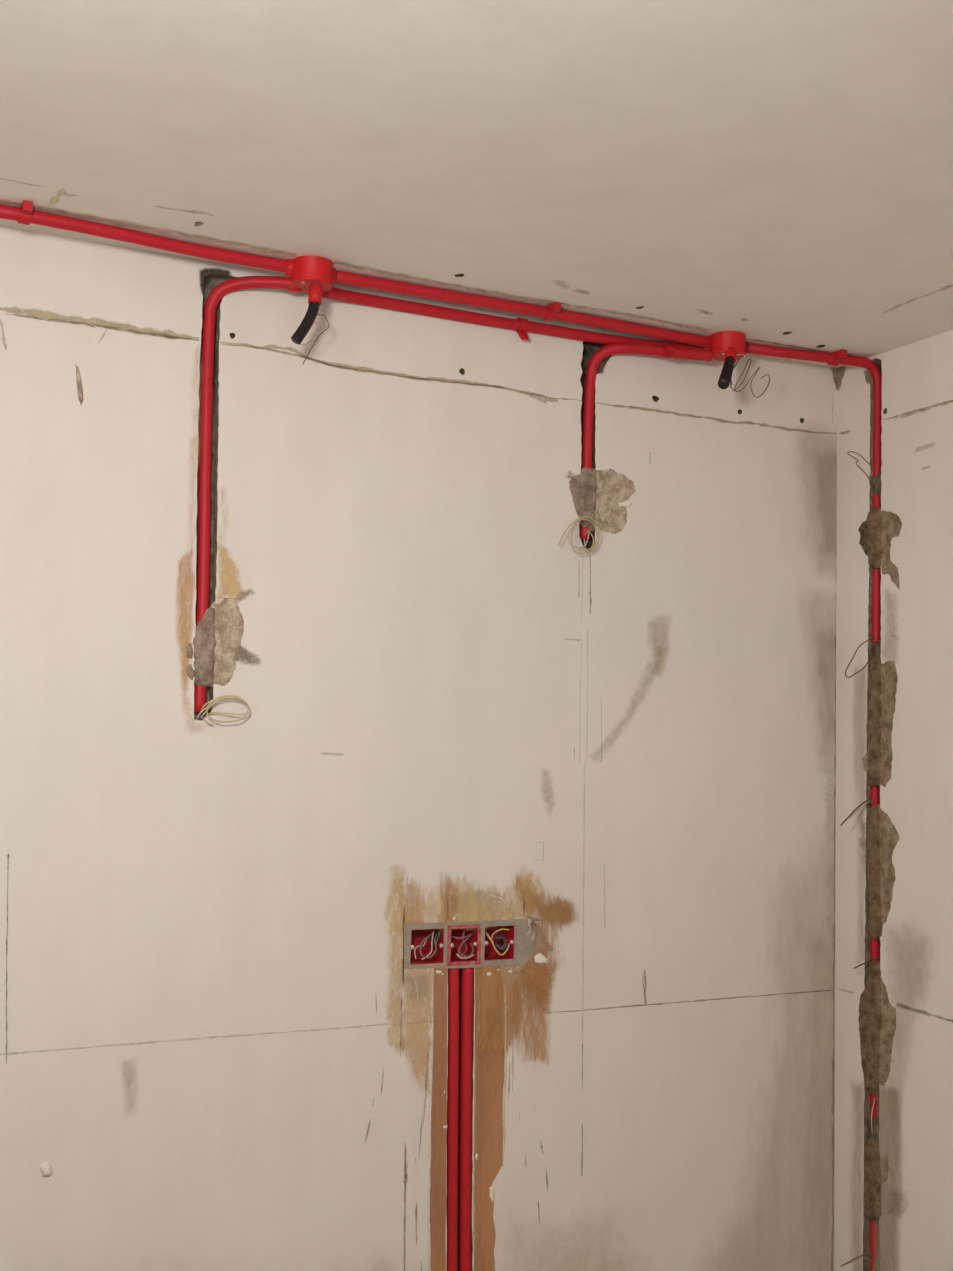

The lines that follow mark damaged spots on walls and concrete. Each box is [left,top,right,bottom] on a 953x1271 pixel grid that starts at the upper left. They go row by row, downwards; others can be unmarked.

spalling [211,598,244,686]
peeling [428,968,447,1271]
peeling [473,964,513,1271]